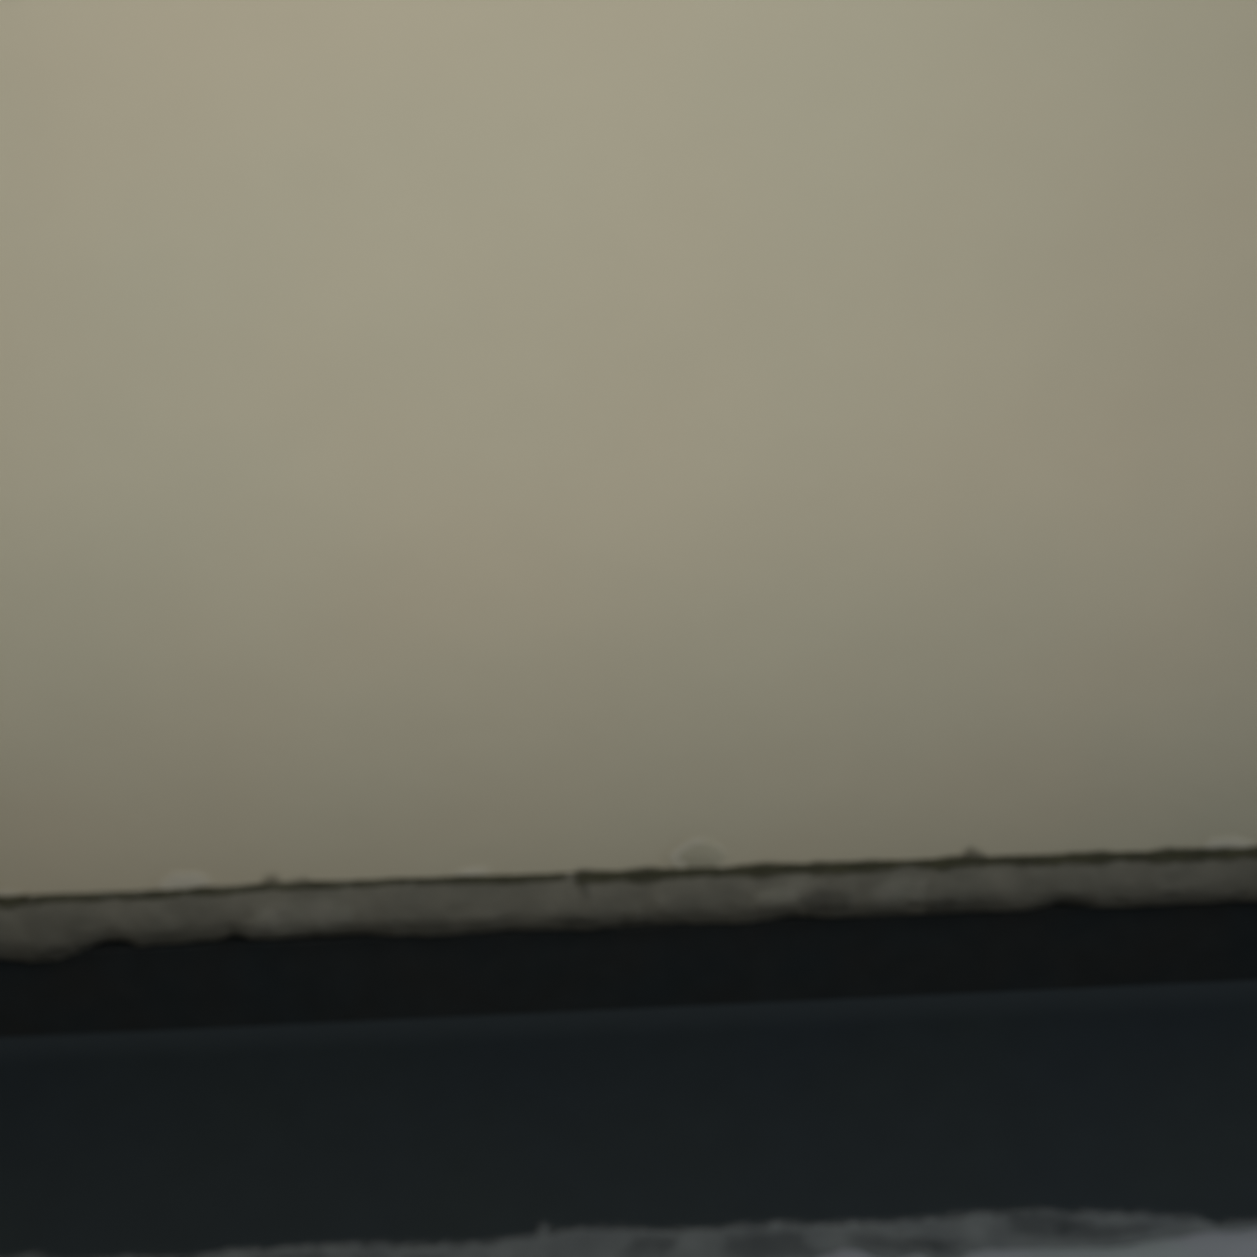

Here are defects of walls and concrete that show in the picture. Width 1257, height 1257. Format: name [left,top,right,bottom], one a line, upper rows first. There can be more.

crack [0,847,1257,908]